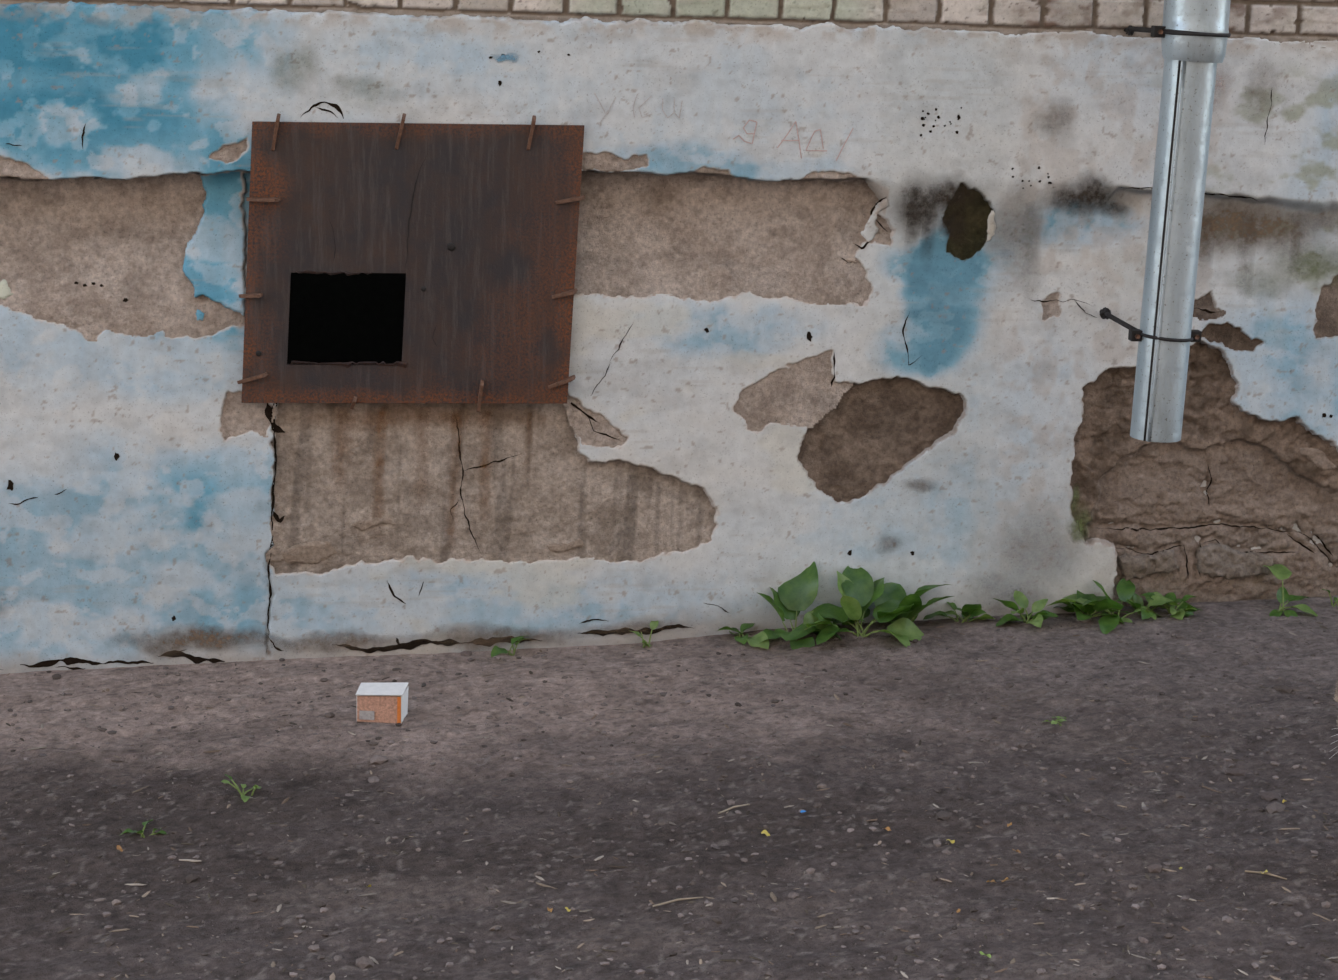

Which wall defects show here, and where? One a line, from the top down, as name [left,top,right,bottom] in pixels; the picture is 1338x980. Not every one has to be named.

spalling [0,156,245,341]
peeling [209,140,247,163]
spalling [574,152,892,306]
peeling [986,210,996,242]
peeling [1313,275,1338,338]
spalling [220,391,716,574]
spalling [734,332,963,502]
spalling [1070,293,1338,606]